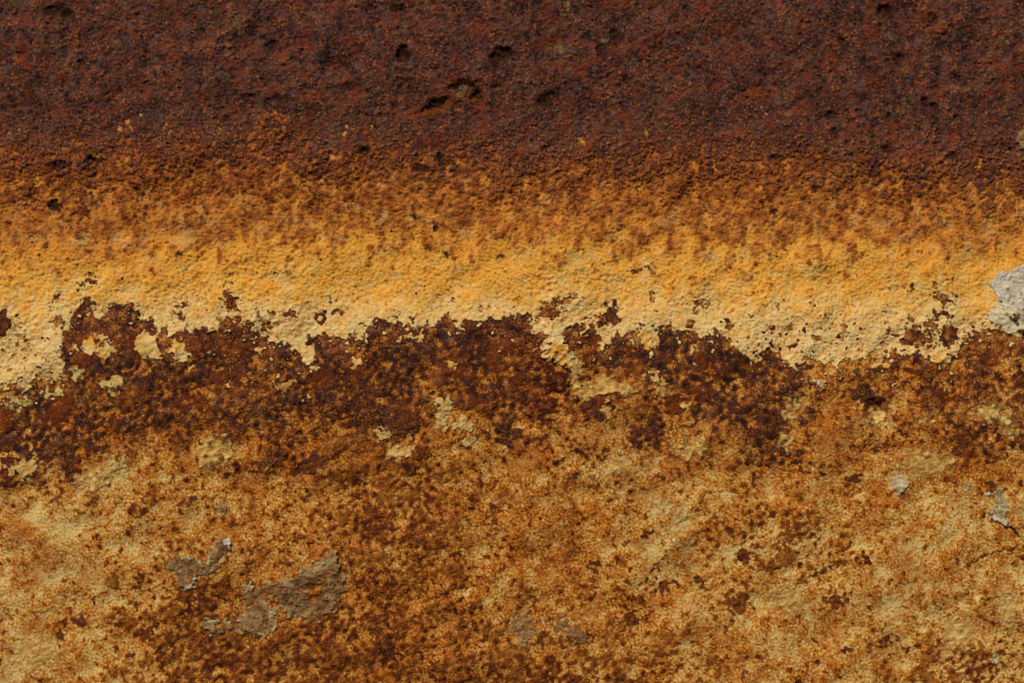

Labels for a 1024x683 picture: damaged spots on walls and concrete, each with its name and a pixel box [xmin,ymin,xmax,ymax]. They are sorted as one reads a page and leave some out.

corrosion [0,0,1024,295]
peeling [0,110,1024,419]
peeling [167,536,232,591]
peeling [200,549,347,638]
corrosion [0,272,1024,683]